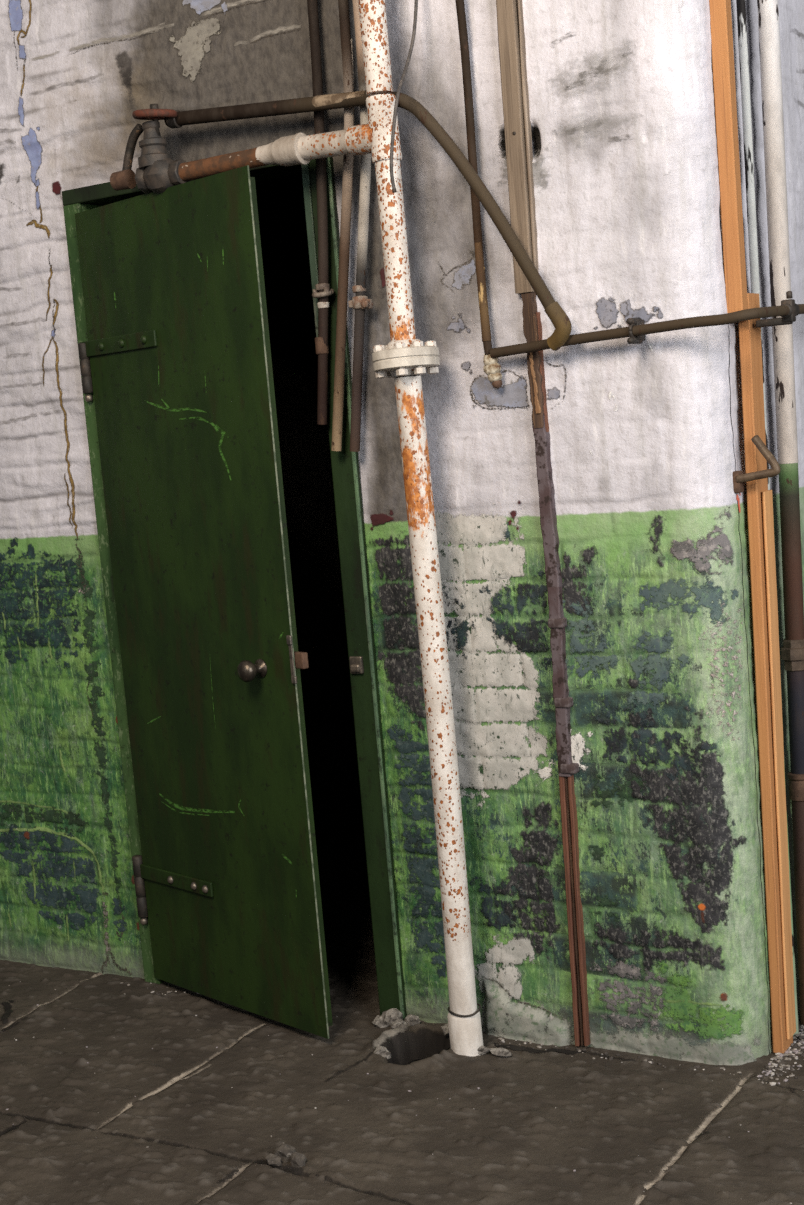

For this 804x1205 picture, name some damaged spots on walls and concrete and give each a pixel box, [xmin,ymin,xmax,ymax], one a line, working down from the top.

peeling [8,0,26,59]
peeling [169,0,228,83]
peeling [18,97,43,209]
peeling [461,361,529,409]
peeling [547,387,560,400]
peeling [0,538,83,668]
crack [1,186,132,1032]
peeling [435,501,762,1065]
spalling [373,1023,409,1048]
crack [635,1075,749,1205]